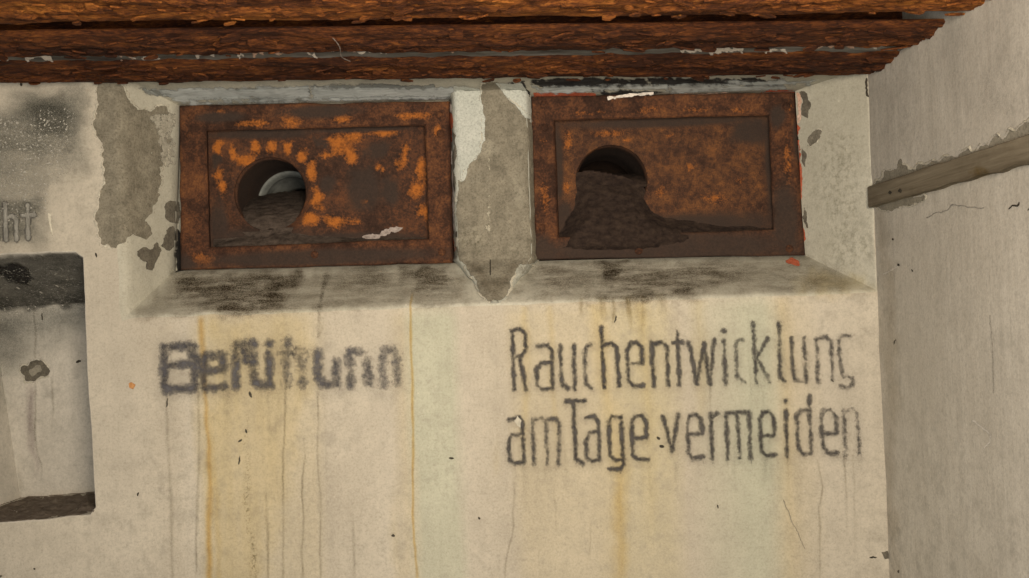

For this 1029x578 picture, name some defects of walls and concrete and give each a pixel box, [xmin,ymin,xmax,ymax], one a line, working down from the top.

spalling [91,83,181,270]
spalling [450,81,654,304]